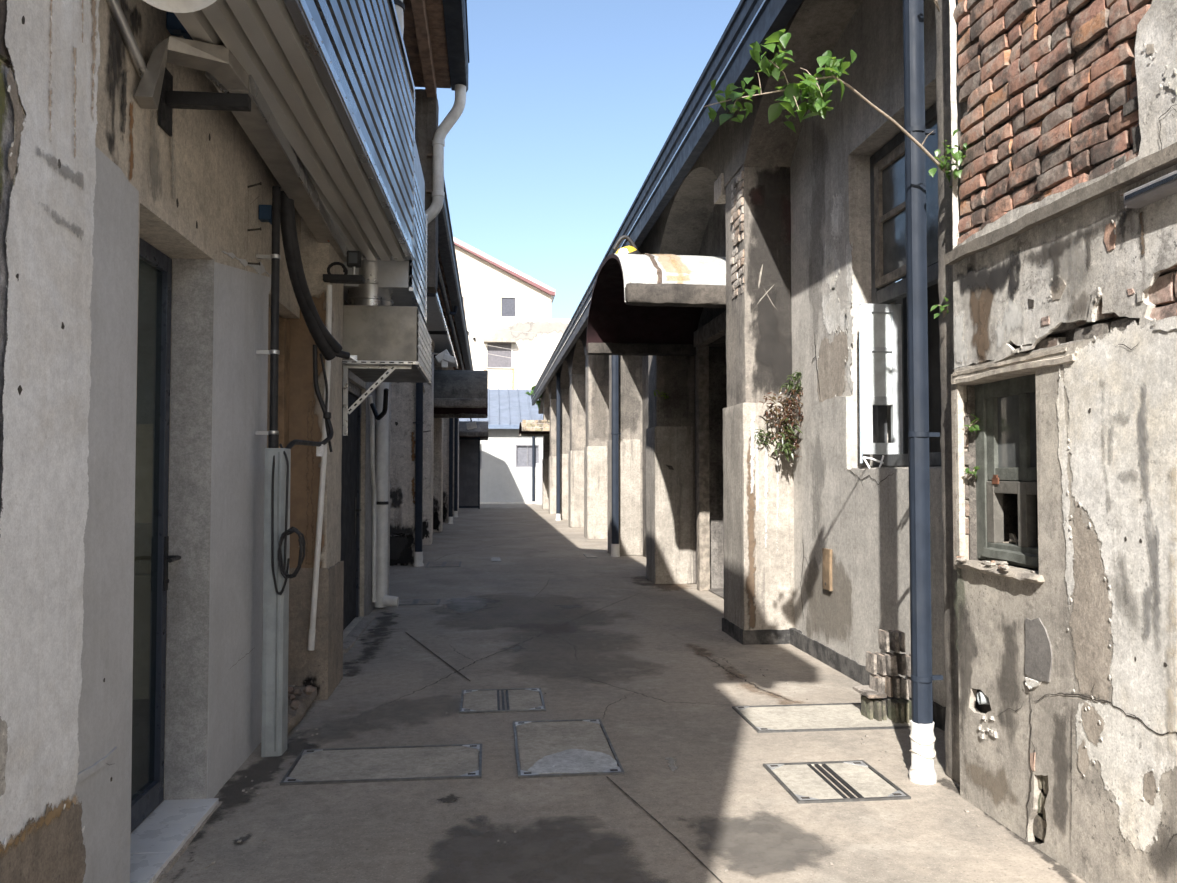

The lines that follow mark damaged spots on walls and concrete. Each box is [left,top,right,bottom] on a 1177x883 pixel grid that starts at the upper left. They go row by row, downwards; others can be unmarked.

peeling [7,68,25,181]
leakage [107,0,142,153]
flaking render [953,0,1157,245]
peeling [1159,59,1177,95]
spalling [1104,220,1117,251]
spalling [1014,248,1177,355]
leakage [746,412,779,629]
peeling [981,560,1010,570]
peeling [0,787,86,883]
crack [998,684,1177,856]
peeling [1142,769,1160,805]